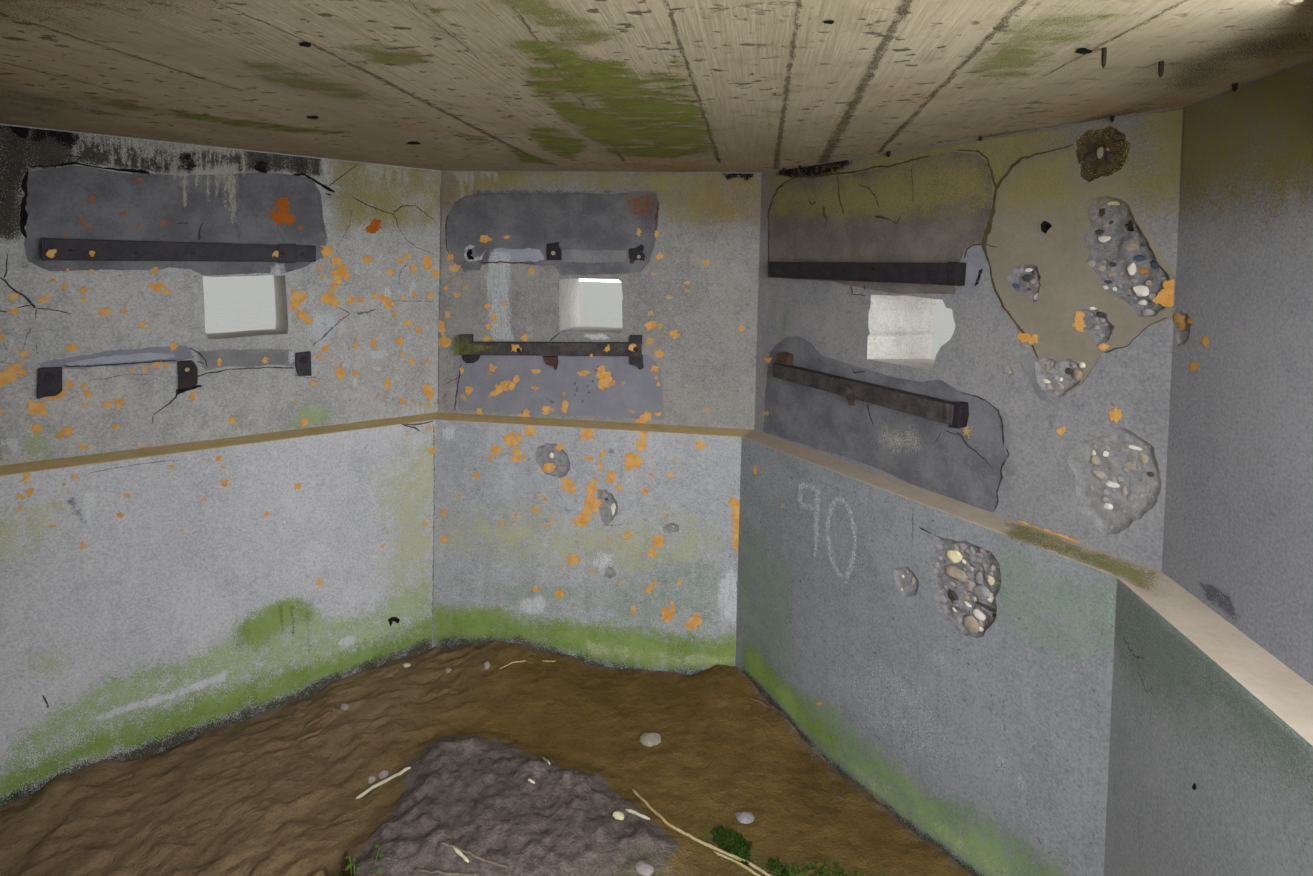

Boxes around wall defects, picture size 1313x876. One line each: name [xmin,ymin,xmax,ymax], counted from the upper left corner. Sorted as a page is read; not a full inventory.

leakage [0,0,1313,246]
spalling [1076,126,1130,182]
crack [480,258,534,266]
spalling [1081,196,1191,347]
crack [0,155,462,631]
spalling [1034,356,1086,398]
spalling [536,443,570,478]
spalling [597,489,618,524]
spalling [1067,427,1161,535]
spalling [891,534,1001,638]
leakage [0,632,709,806]
leakage [739,641,982,876]